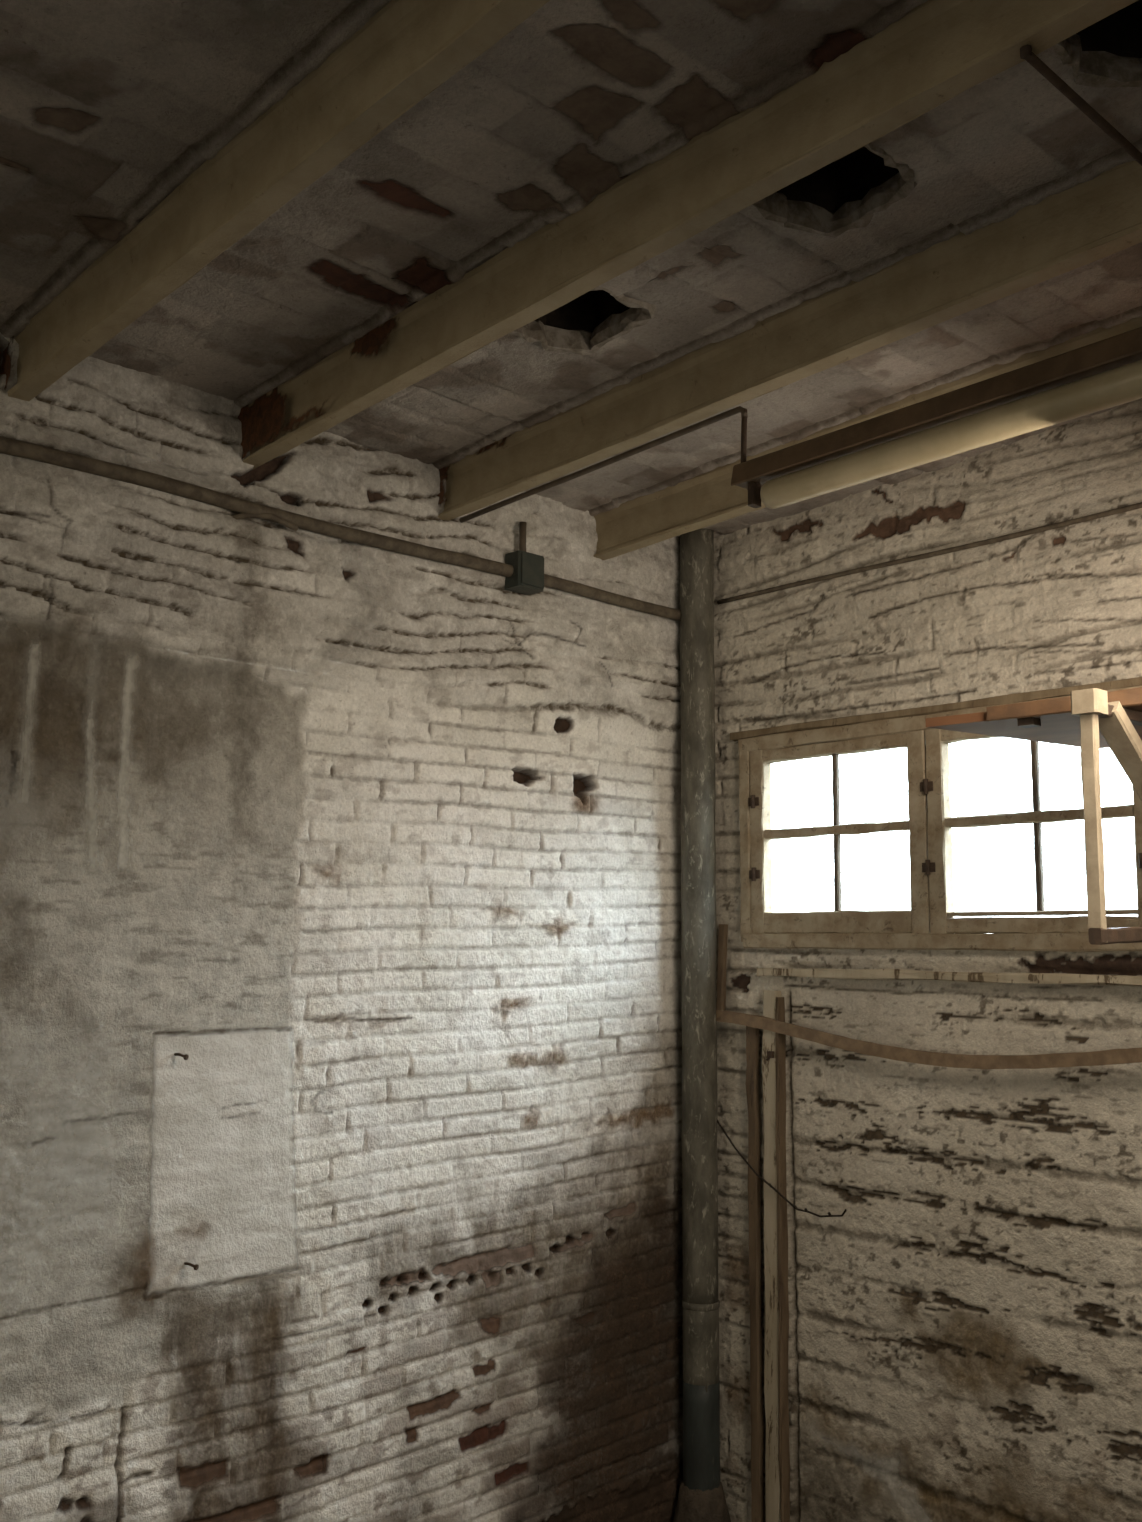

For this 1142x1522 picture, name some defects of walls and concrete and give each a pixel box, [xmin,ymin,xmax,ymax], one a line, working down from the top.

spalling [777,146,899,213]
spalling [534,290,630,333]
water stain [19,645,38,802]
water stain [85,719,98,872]
water stain [116,657,137,868]
spalling [1018,954,1142,976]
spalling [917,1098,1116,1135]
water stain [424,1144,683,1522]
spalling [888,1235,1142,1337]
crack [11,1407,153,1522]
water stain [166,1300,289,1522]
spalling [405,1389,506,1452]